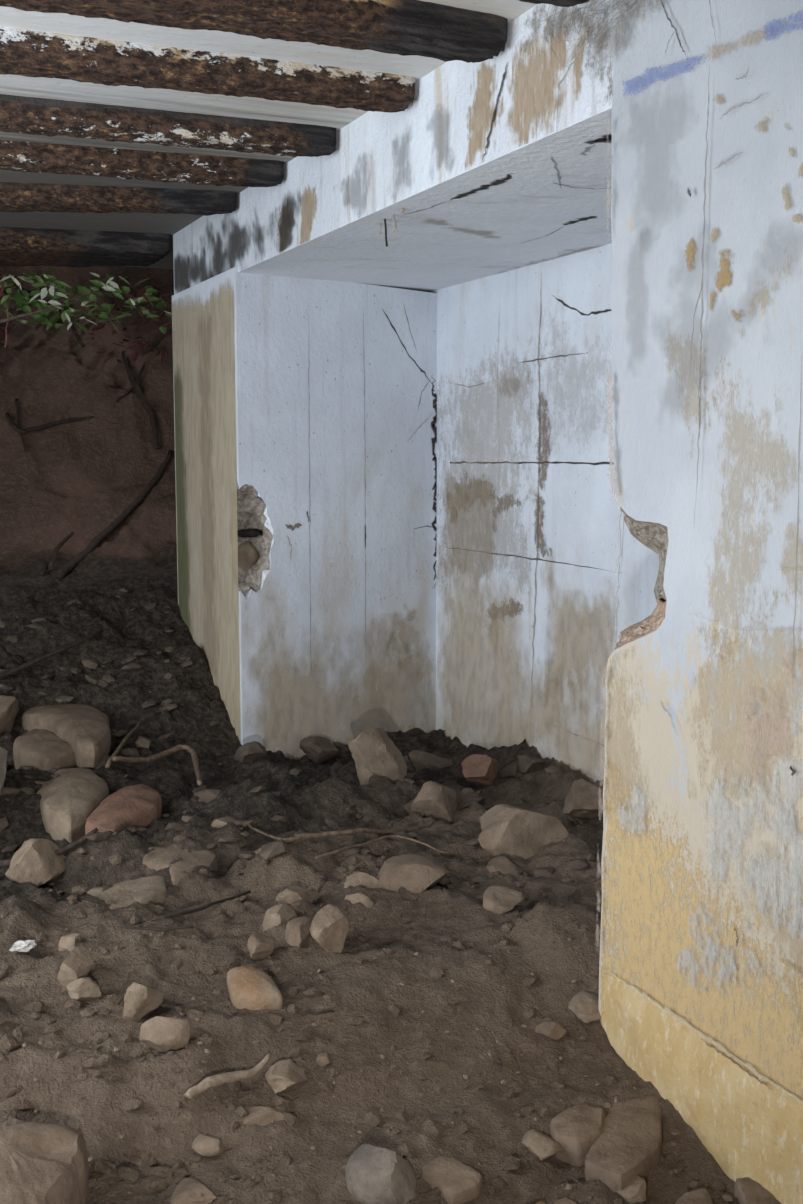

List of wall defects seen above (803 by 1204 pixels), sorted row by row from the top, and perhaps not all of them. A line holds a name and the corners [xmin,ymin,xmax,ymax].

crack [450,62,514,200]
peeling [782,187,802,222]
spalling [237,482,273,596]
damp [446,473,521,533]
crack [383,292,614,746]
spalling [607,370,669,650]
damp [265,614,424,758]
damp [444,586,803,1101]